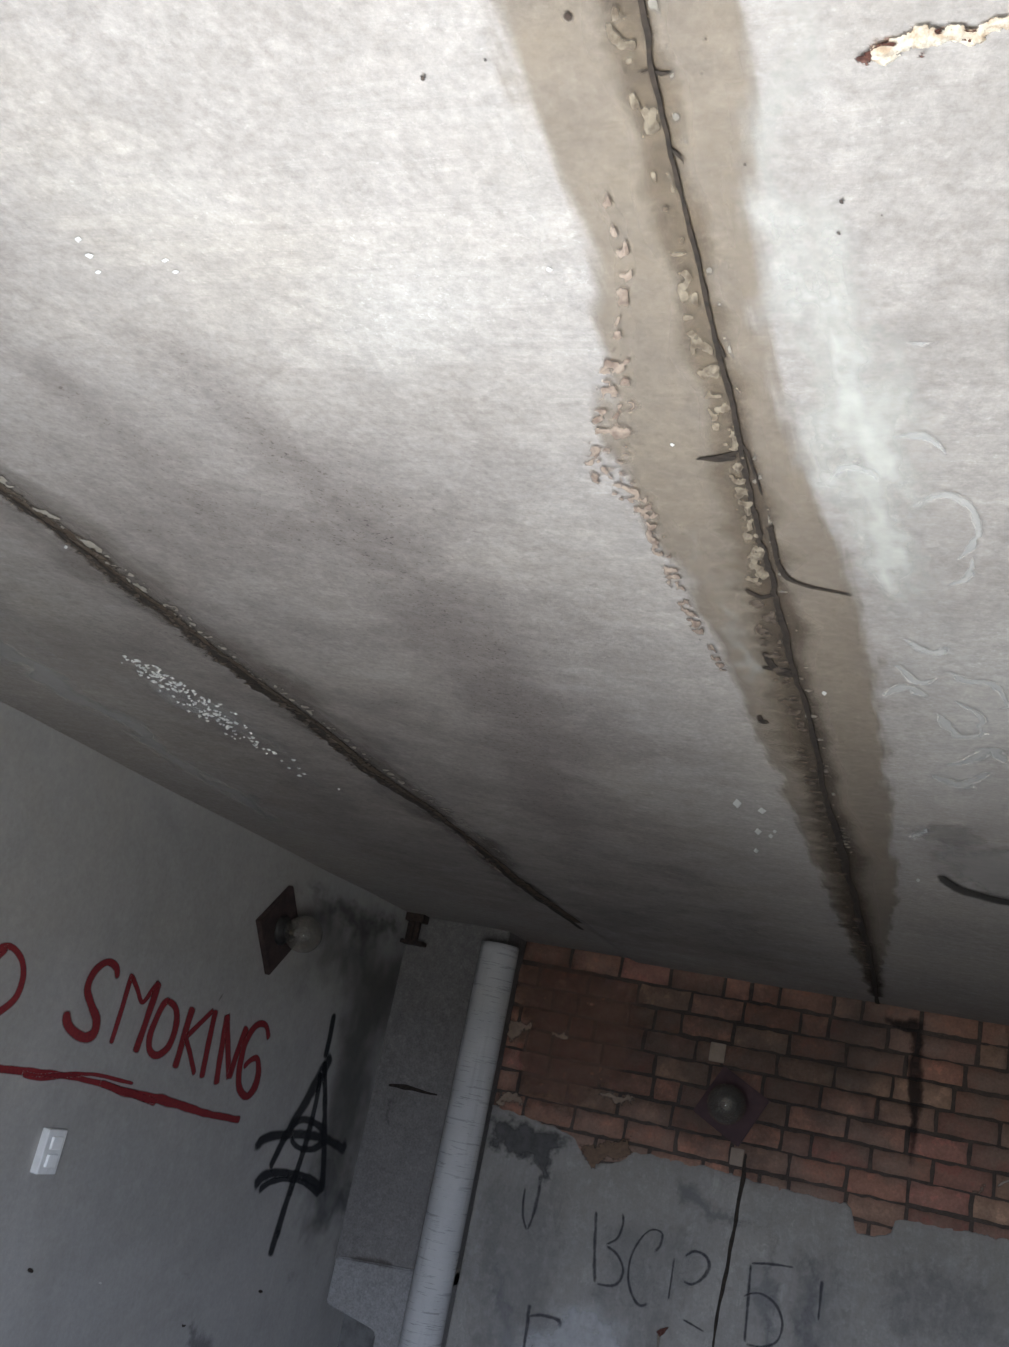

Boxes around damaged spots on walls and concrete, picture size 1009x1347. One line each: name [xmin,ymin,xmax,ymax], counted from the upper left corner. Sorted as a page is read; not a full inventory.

spalling [855,16,1009,66]
crack [0,475,584,930]
damp [504,0,896,997]
crack [637,0,880,1004]
damp [819,334,910,591]